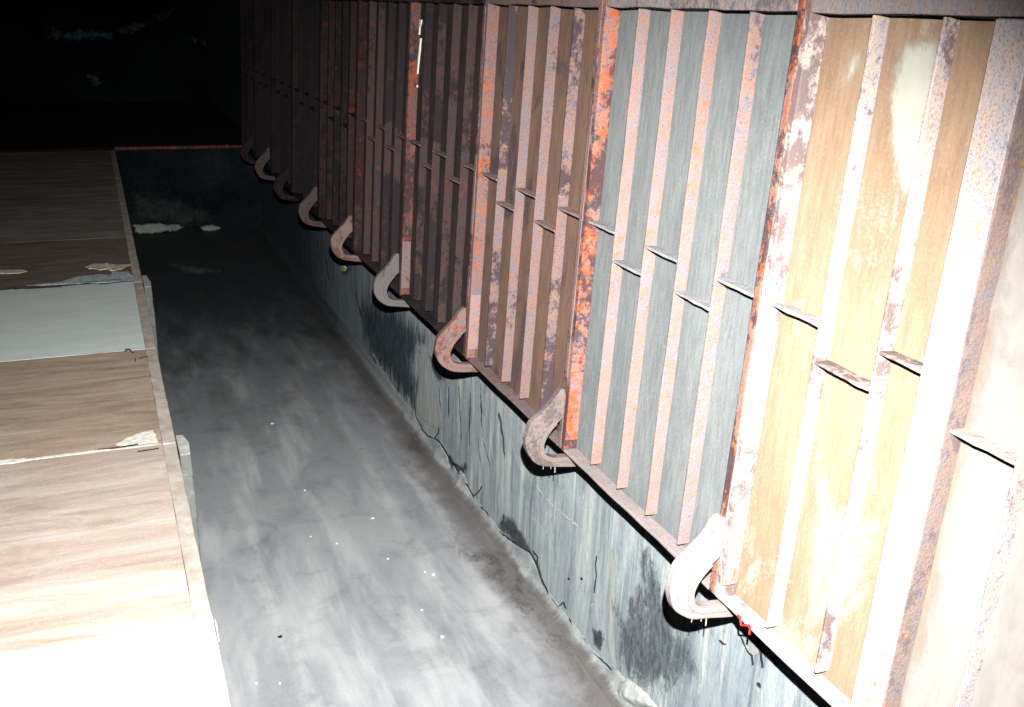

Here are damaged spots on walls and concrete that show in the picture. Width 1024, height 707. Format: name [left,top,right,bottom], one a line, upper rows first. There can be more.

crack [414,406,612,670]
water stain [607,550,693,690]